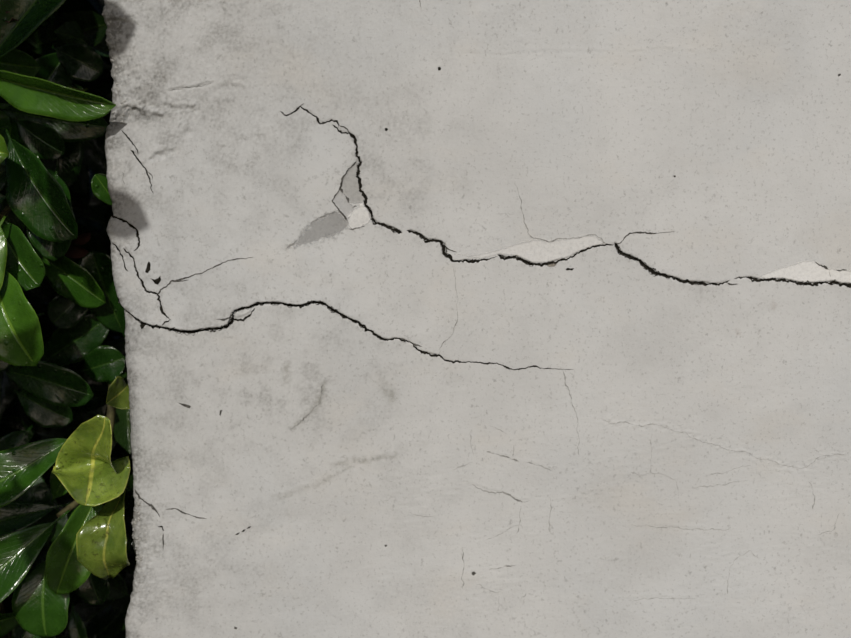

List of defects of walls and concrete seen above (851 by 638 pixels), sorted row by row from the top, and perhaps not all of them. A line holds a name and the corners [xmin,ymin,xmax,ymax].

peeling [288,162,371,248]
crack [111,104,851,454]
spalling [466,236,603,267]
spalling [761,261,851,283]